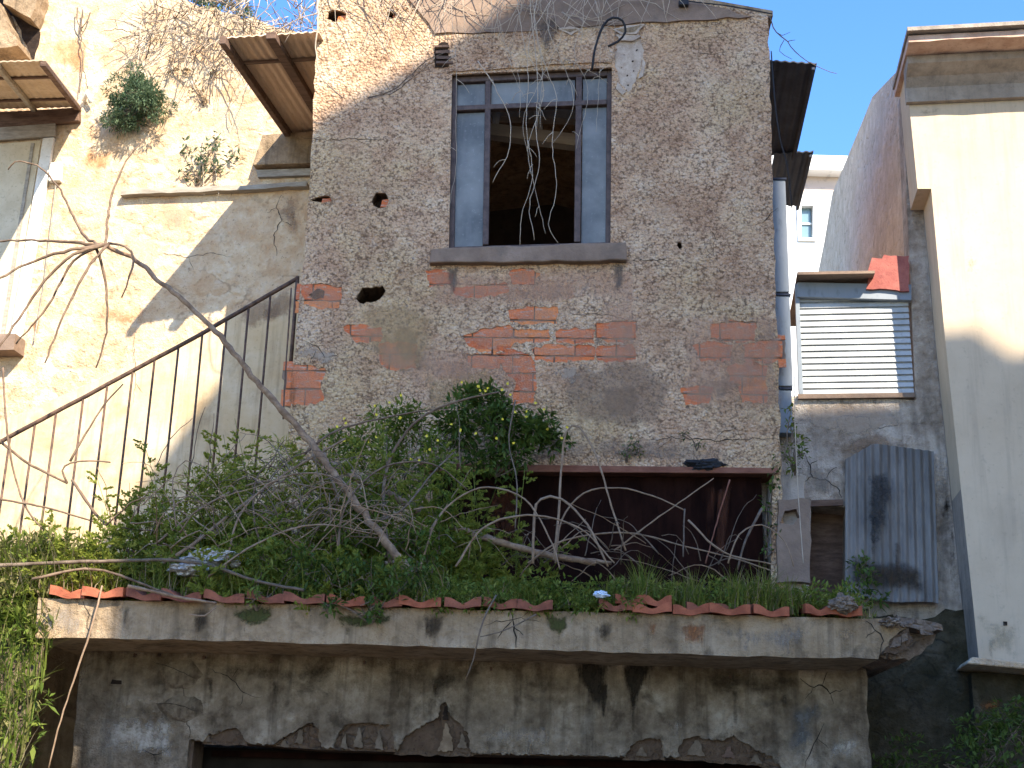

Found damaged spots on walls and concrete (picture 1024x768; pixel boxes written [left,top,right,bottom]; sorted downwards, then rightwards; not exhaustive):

flaking render [295,283,342,313]
flaking render [426,268,540,298]
flaking render [464,306,638,404]
flaking render [693,320,786,369]
flaking render [280,361,327,408]
damp [578,664,607,716]
damp [624,665,652,706]
spalling [341,702,473,757]
spalling [622,735,780,768]
crack [800,673,842,765]